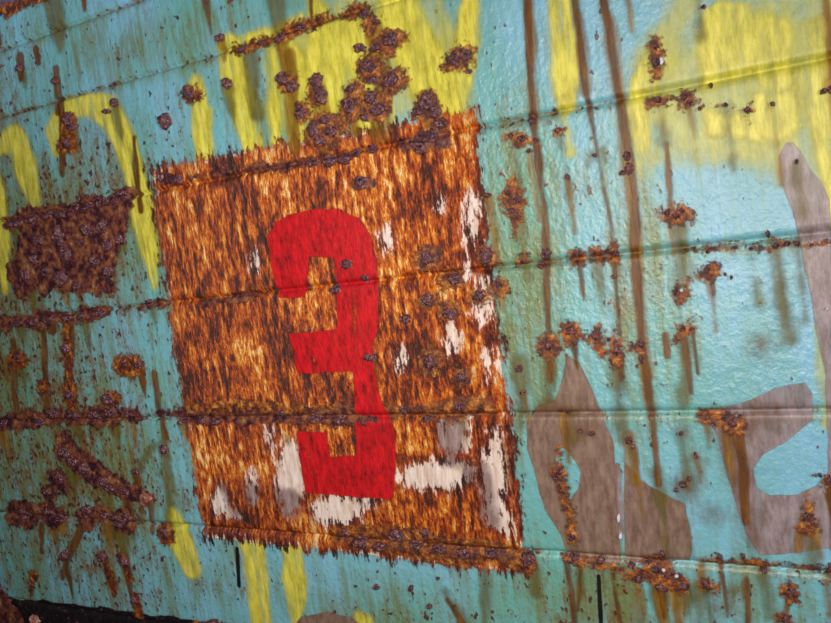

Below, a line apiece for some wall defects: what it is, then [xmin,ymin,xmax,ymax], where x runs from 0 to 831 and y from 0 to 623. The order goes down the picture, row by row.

corrosion [820,0,831,95]
corrosion [644,88,705,116]
corrosion [715,100,756,125]
corrosion [655,127,831,307]
corrosion [0,0,665,622]
corrosion [662,318,699,406]
corrosion [548,407,831,623]